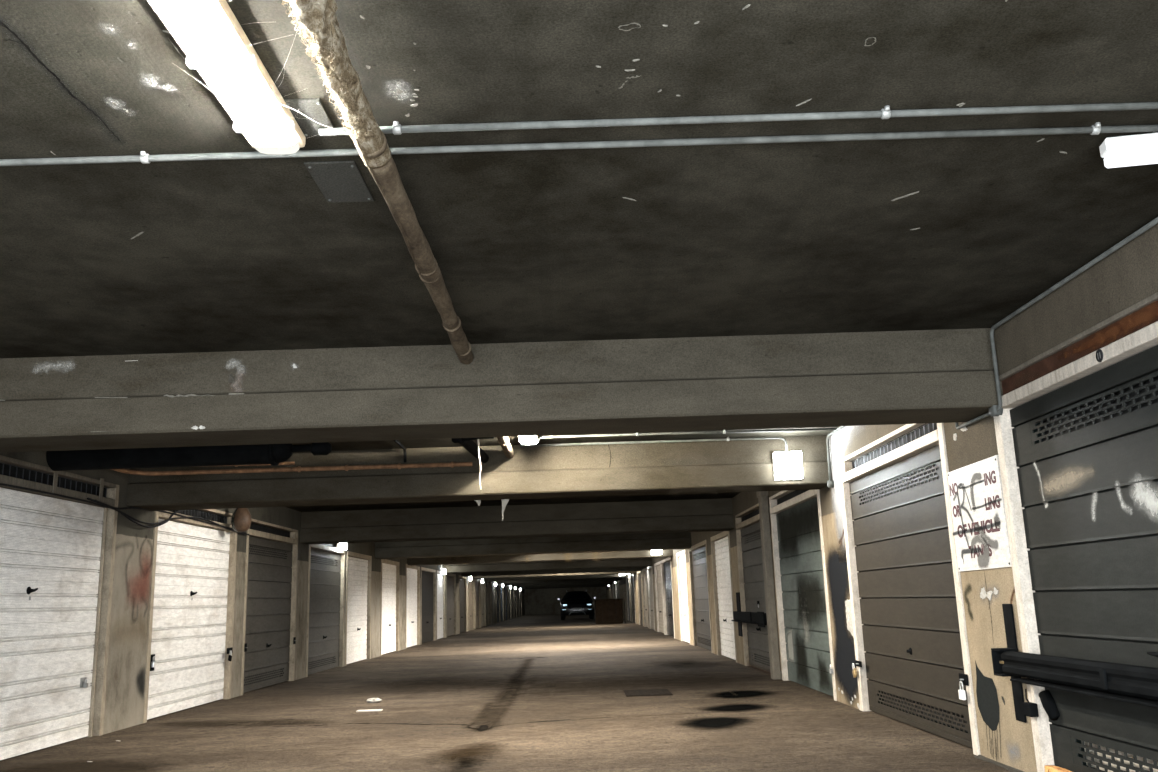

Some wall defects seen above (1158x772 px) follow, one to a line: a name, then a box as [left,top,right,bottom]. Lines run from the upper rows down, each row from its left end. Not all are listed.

crack [0,21,120,141]